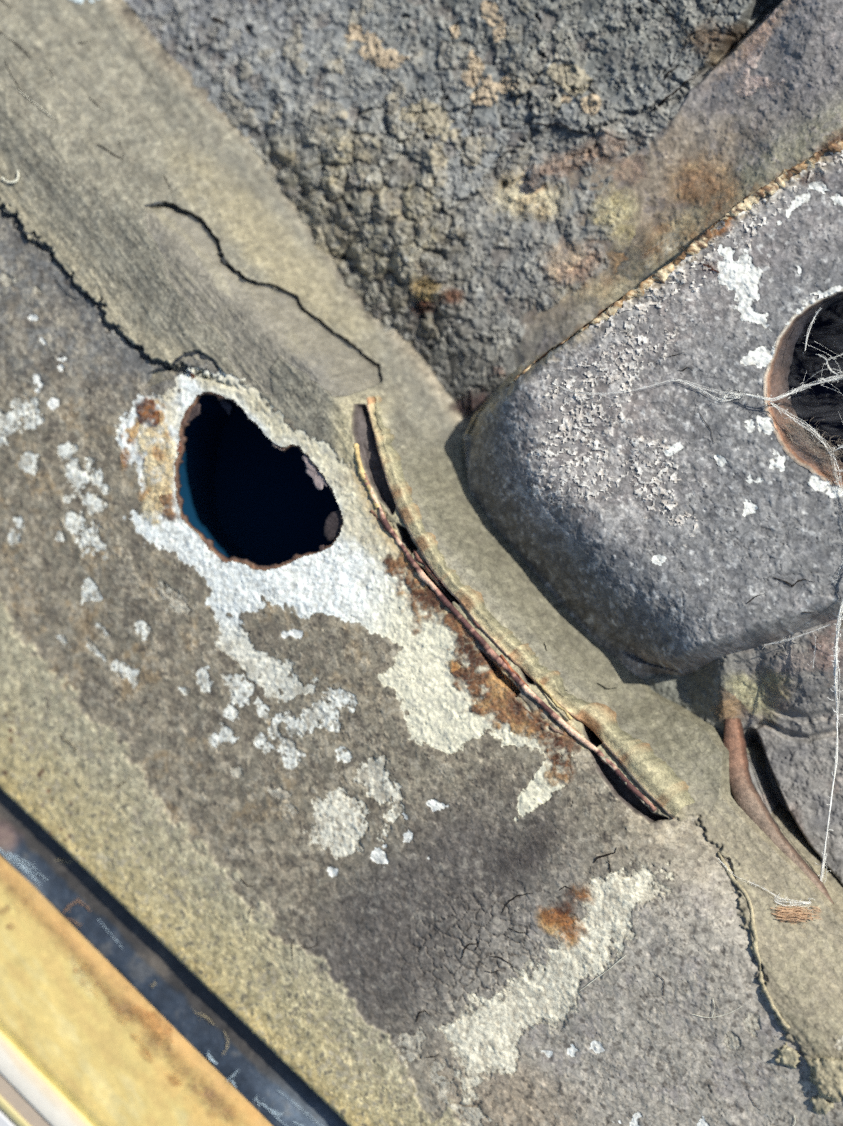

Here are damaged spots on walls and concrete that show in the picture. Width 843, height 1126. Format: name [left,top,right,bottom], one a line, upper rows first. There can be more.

crack [0,206,90,299]
crack [144,176,379,367]
crack [148,352,220,379]
rust [121,397,176,524]
spalling [176,395,343,566]
rust [383,552,581,786]
rust [539,889,589,946]